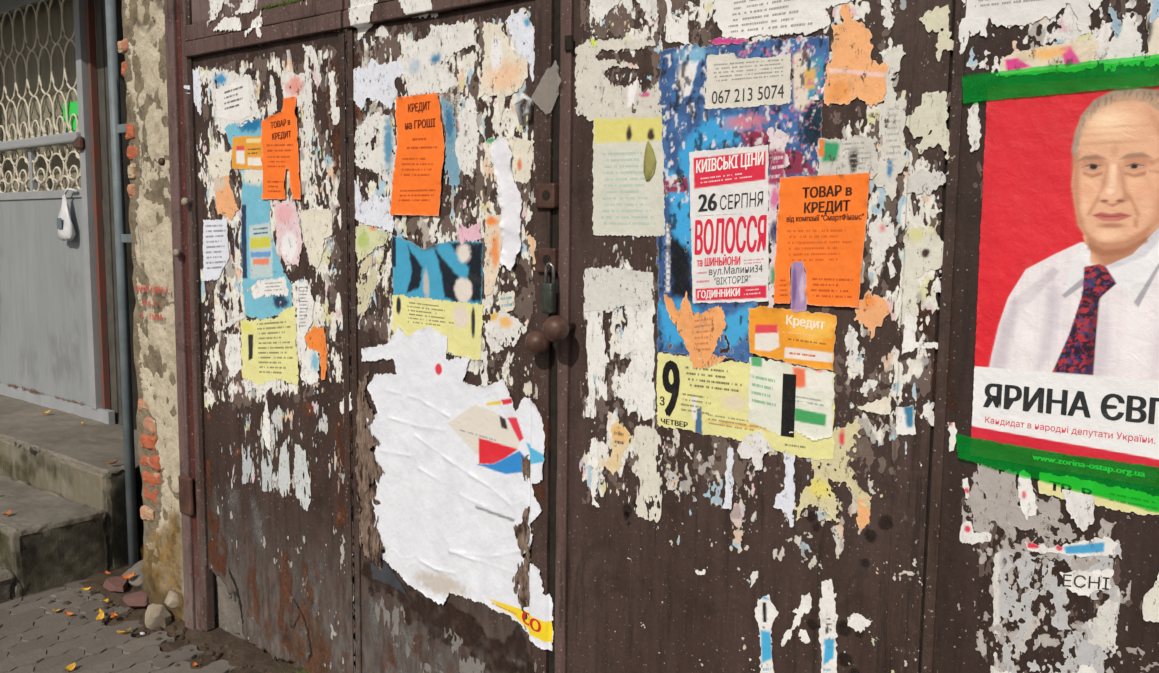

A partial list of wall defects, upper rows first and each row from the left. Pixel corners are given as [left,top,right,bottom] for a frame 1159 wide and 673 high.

flaking render [138,398,161,521]